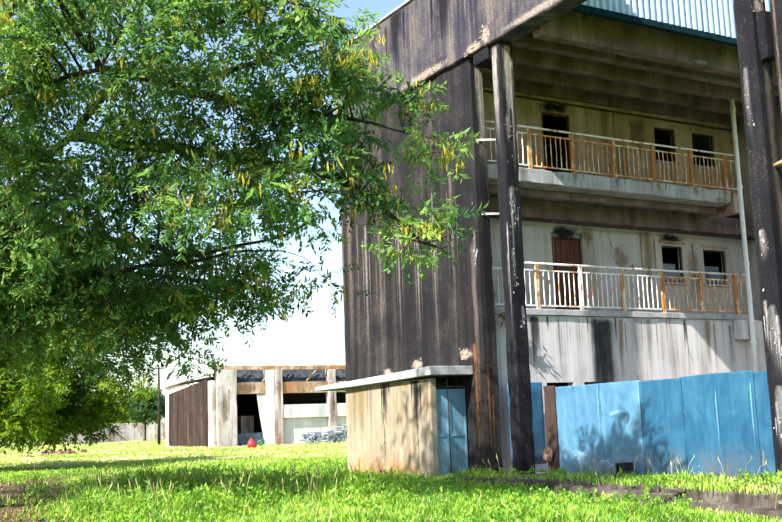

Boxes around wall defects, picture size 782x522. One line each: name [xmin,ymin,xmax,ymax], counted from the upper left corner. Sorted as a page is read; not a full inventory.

damp [385,12,404,57]
damp [430,0,448,28]
spalling [464,21,490,57]
damp [530,316,548,352]
damp [587,318,627,383]
peeling [762,288,782,356]
damp [411,380,427,414]
peeling [773,387,782,439]